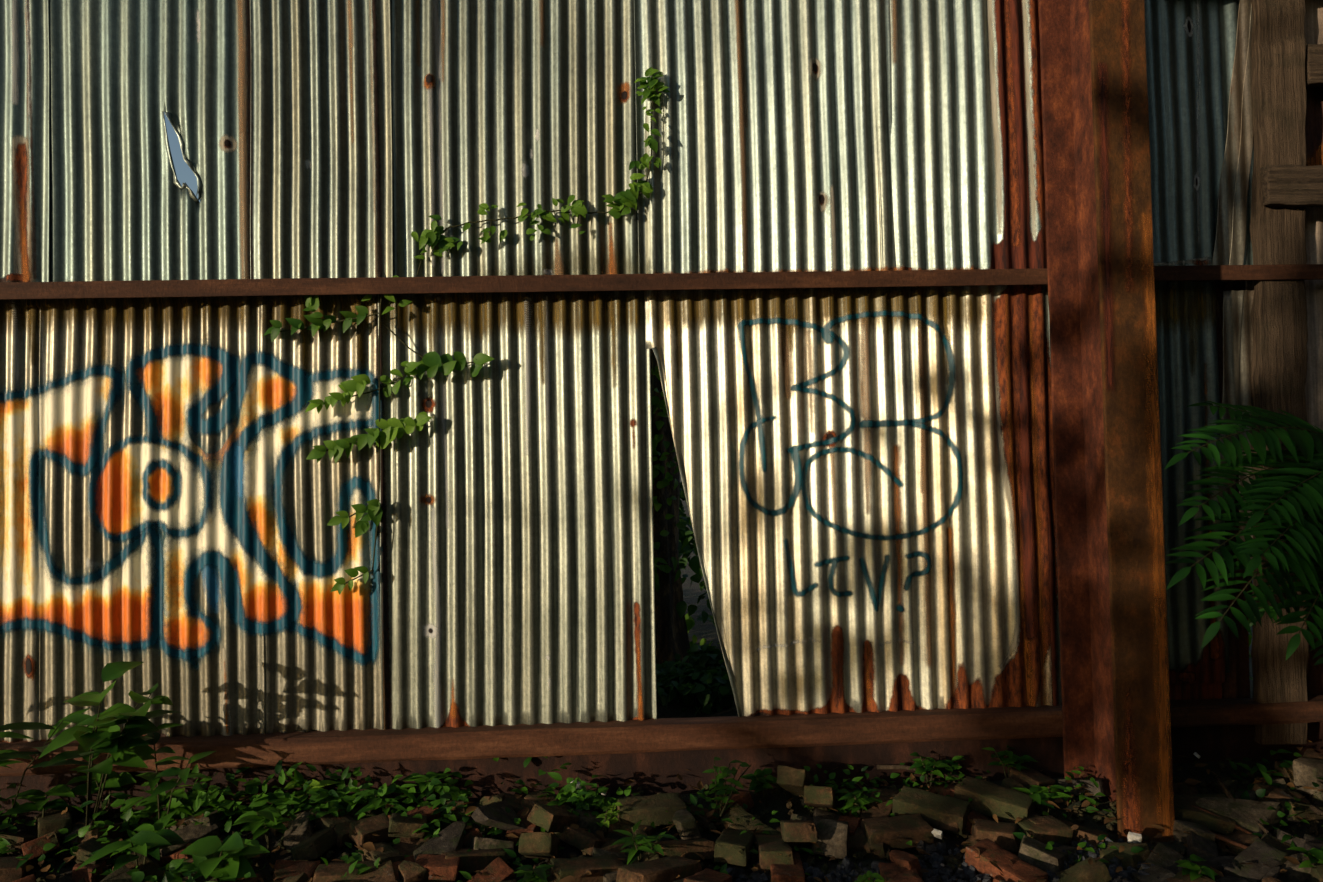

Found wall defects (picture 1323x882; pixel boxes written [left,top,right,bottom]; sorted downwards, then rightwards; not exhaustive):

corrosion [0,136,34,282]
corrosion [849,0,1047,271]
corrosion [632,602,653,721]
corrosion [749,445,925,717]
corrosion [861,317,871,513]
corrosion [919,315,931,666]
corrosion [946,285,1059,709]